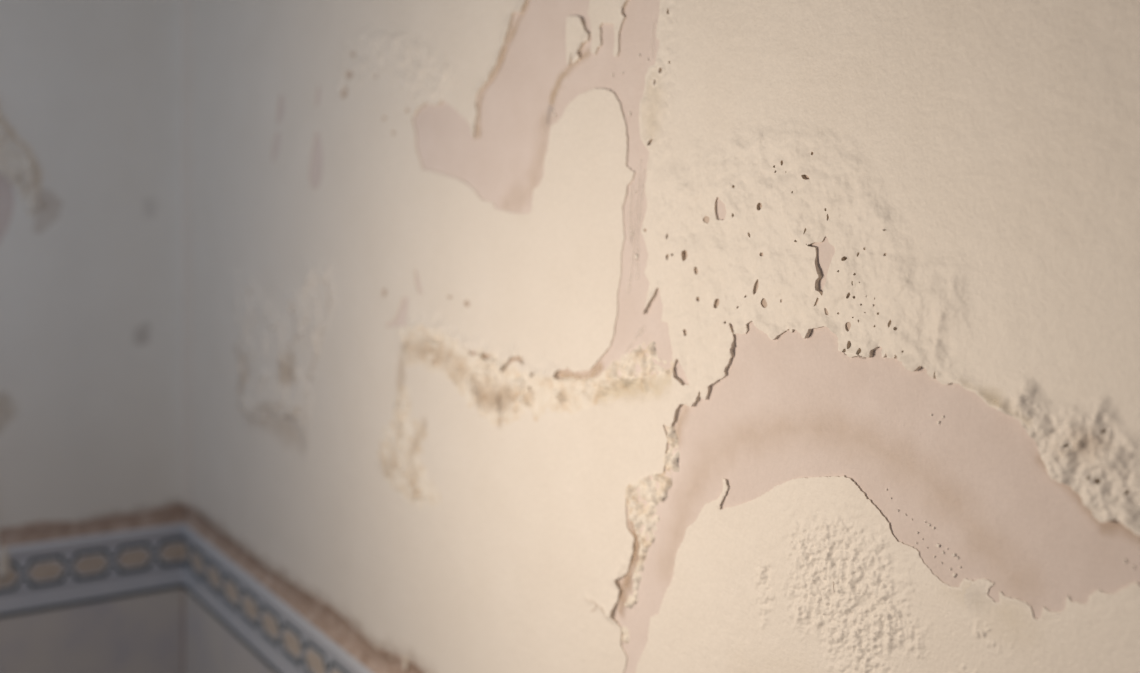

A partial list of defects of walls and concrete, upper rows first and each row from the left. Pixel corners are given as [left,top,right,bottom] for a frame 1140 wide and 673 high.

peeling [397,0,1140,673]